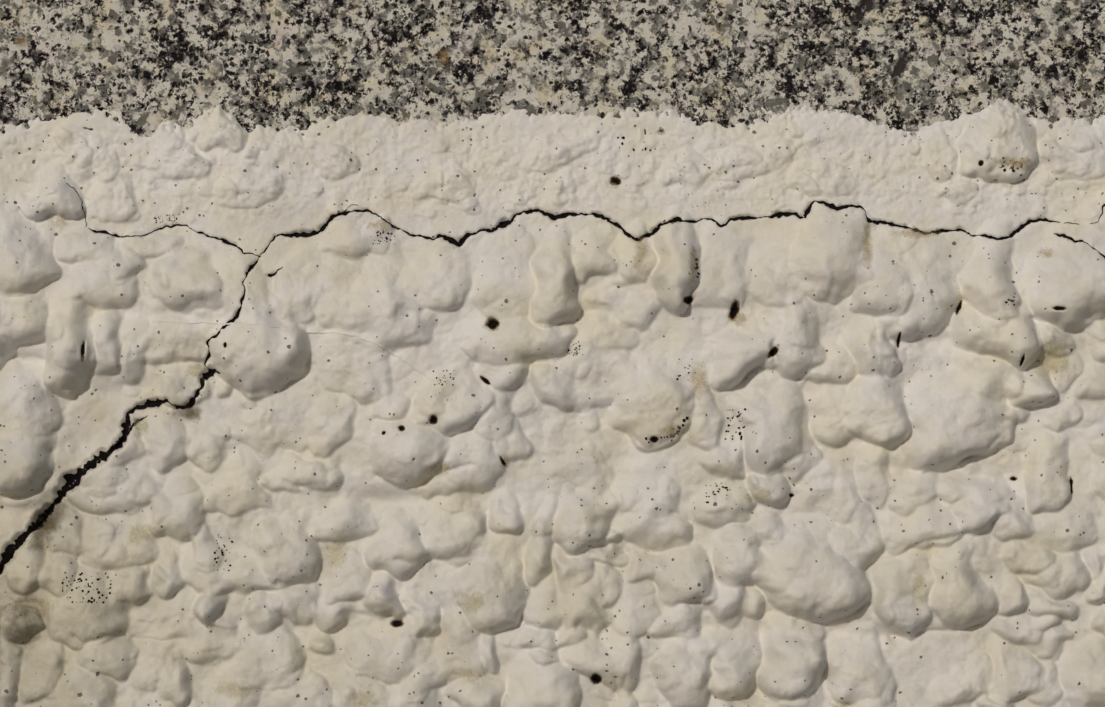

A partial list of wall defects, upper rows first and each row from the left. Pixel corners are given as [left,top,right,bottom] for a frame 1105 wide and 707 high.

crack [0,183,1105,574]